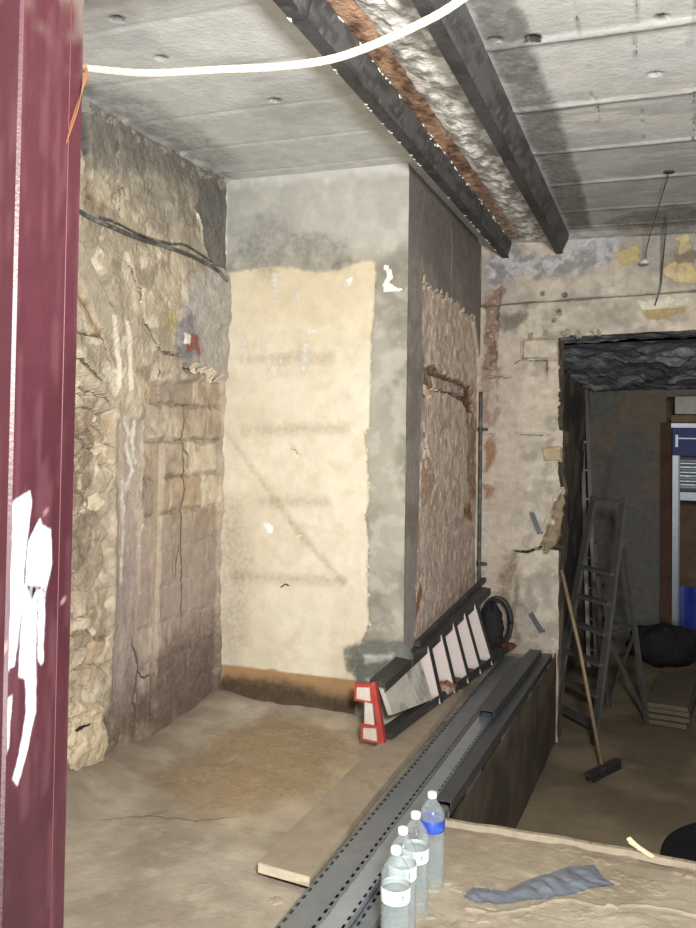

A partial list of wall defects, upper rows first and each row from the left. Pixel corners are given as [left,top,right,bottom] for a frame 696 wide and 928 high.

peeling [423,384,436,399]
rust [485,441,495,471]
spalling [419,457,435,507]
crack [174,403,188,633]
spalling [514,445,565,582]